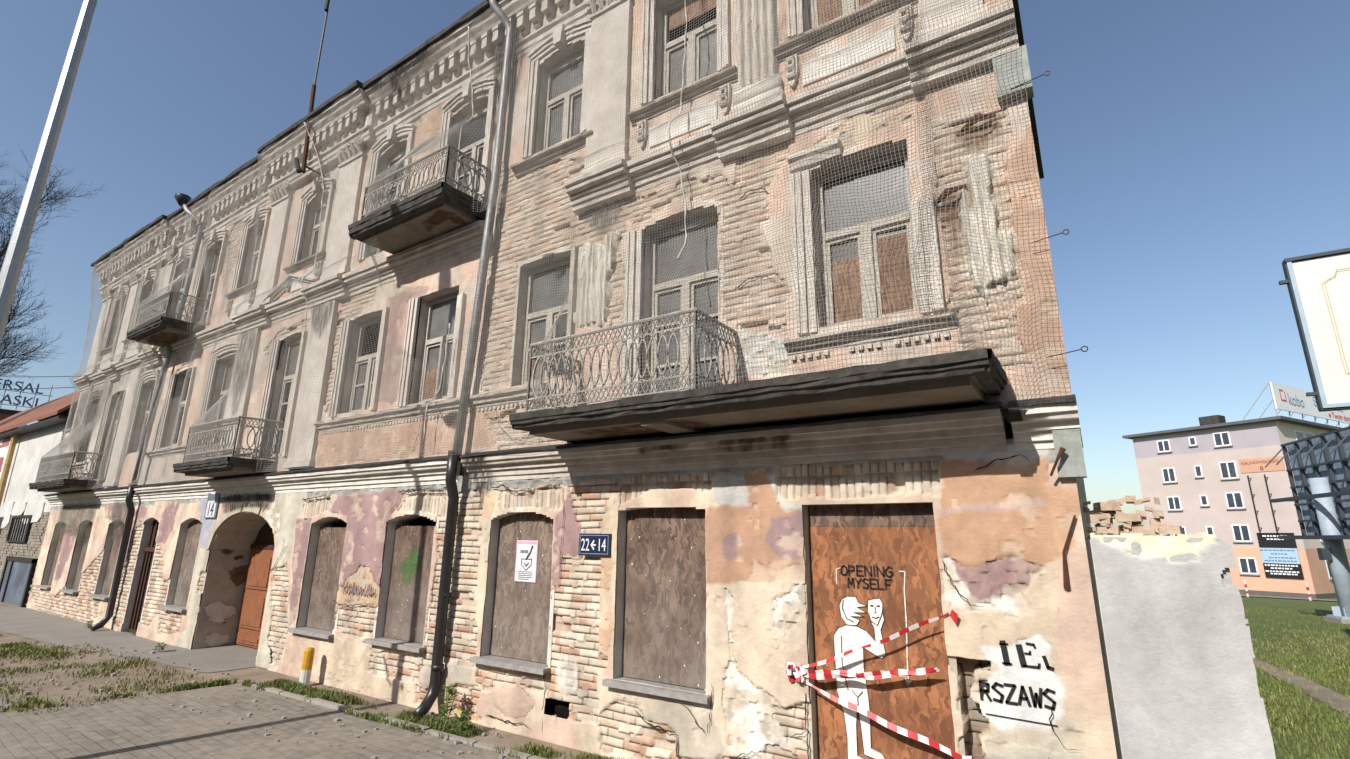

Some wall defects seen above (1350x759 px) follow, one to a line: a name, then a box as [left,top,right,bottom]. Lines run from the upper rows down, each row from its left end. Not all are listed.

peeling [815,92,924,150]
spalling [482,141,791,392]
spalling [932,110,1032,372]
spalling [500,471,713,534]
spalling [32,525,182,635]
spalling [336,488,685,759]
peeling [722,583,813,759]
peeling [942,554,1044,617]
peeling [956,634,1065,759]